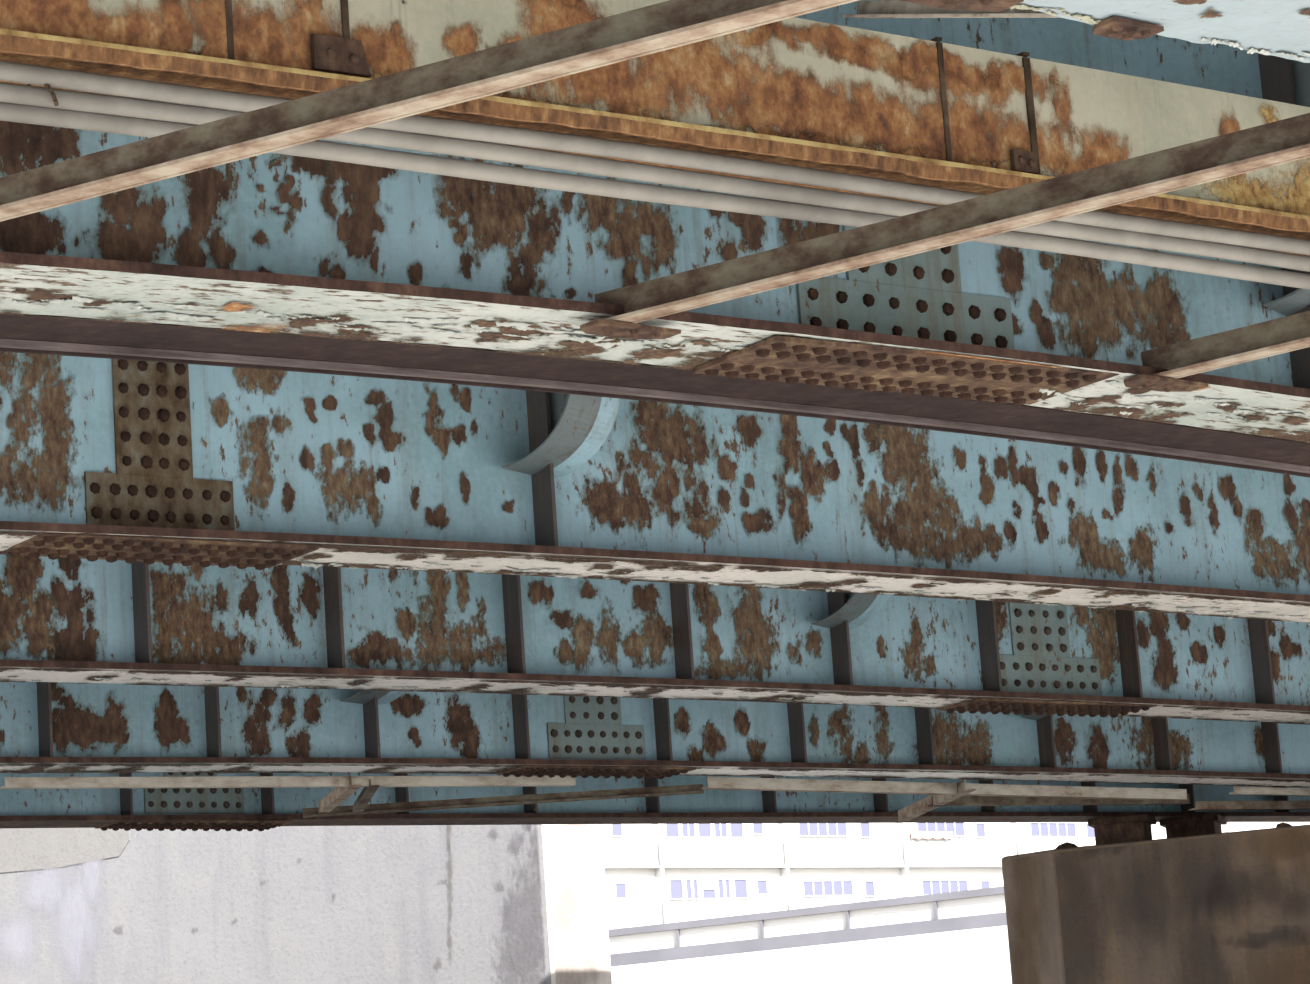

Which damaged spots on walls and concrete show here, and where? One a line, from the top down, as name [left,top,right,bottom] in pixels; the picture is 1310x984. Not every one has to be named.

rust [0,0,415,79]
peeling [1010,4,1106,24]
peeling [1201,37,1310,60]
rust [491,22,1129,177]
rust [0,167,236,269]
rust [256,154,397,279]
rust [436,175,677,299]
peeling [0,295,746,358]
peeling [1038,389,1087,405]
peeling [1106,380,1161,415]
peeling [1195,397,1305,435]
rust [0,384,1310,788]